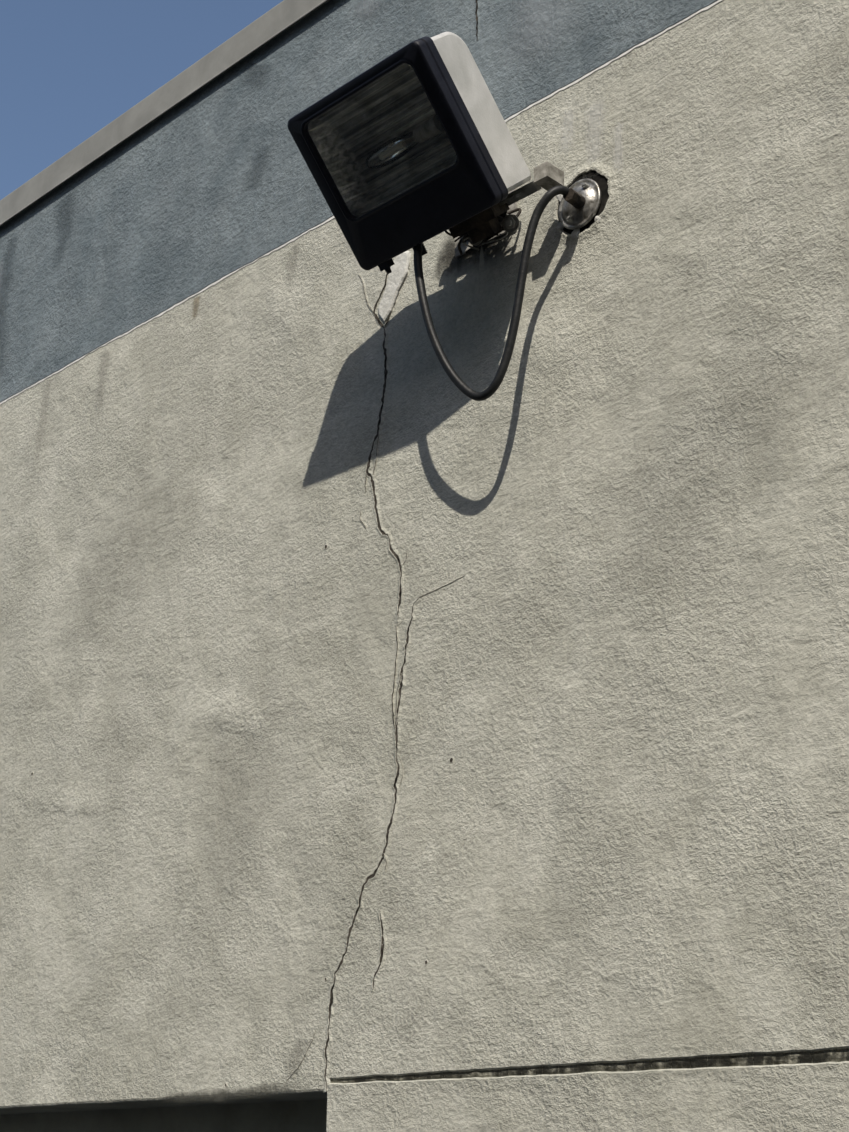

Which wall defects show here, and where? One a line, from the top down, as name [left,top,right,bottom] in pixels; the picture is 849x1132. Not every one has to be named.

crack [473,0,481,41]
crack [287,251,465,1093]